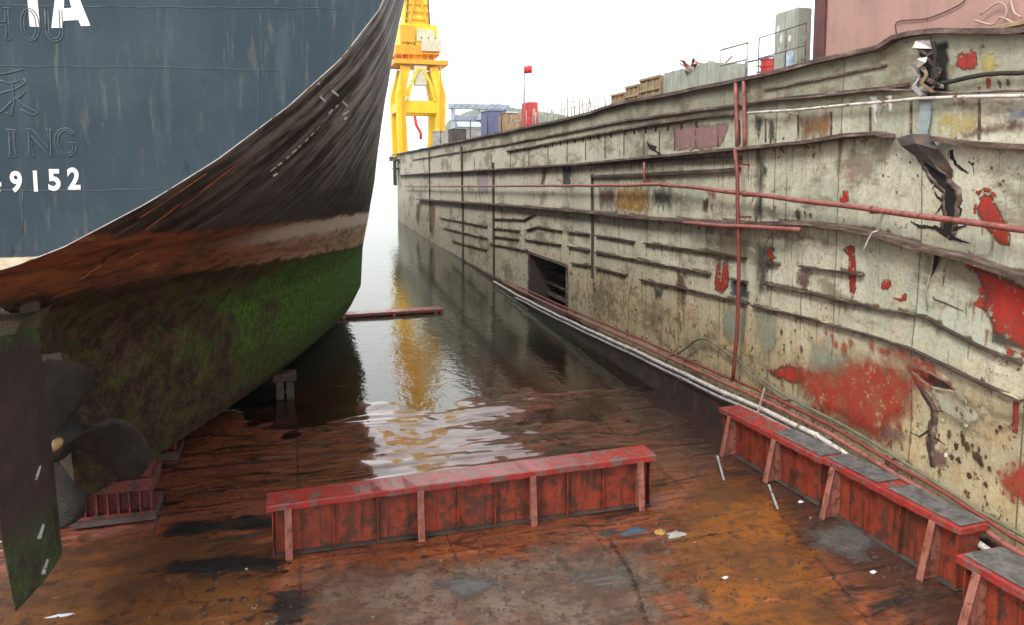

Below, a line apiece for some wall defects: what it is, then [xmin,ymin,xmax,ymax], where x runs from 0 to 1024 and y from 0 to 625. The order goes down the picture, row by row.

peeling [955,49,999,72]
peeling [714,259,729,294]
peeling [756,241,979,441]
crack [911,149,974,313]
peeling [973,187,1011,249]
peeling [965,263,1024,365]
crack [910,371,945,468]
peeling [997,461,1024,504]
rust [0,530,283,625]
rust [649,466,848,625]